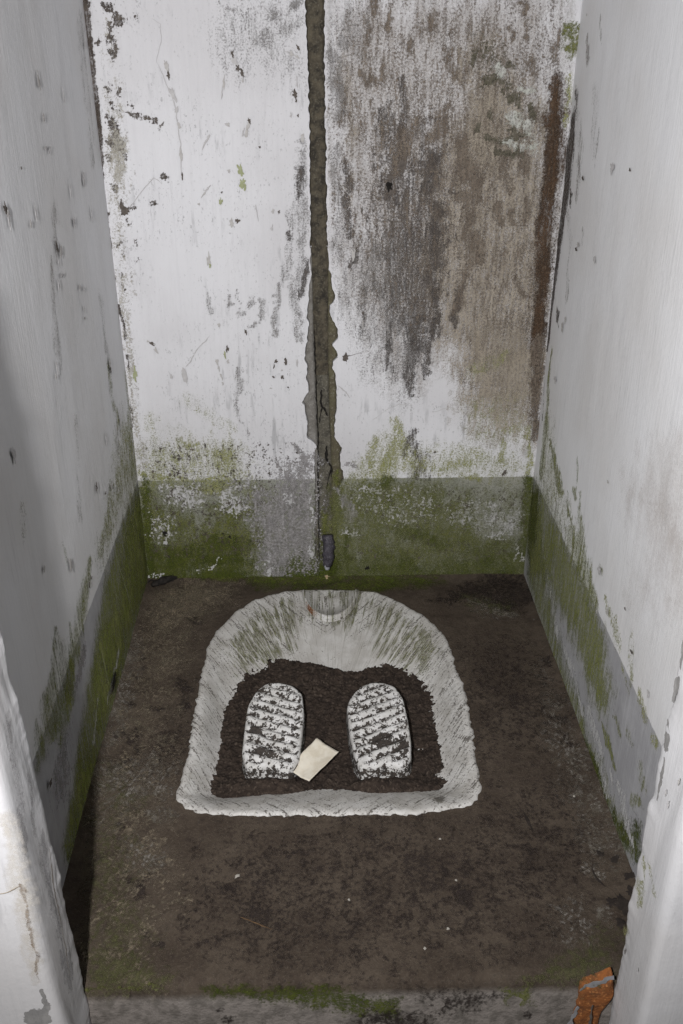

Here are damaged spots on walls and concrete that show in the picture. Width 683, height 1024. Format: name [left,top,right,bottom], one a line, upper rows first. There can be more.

peeling [85,1,138,62]
peeling [103,0,527,577]
damp [327,0,563,480]
flaking render [502,110,538,153]
rust [528,29,572,443]
crack [313,331,350,559]
damp [567,475,603,609]
damp [19,489,110,882]
damp [178,776,591,977]
damp [462,637,651,877]